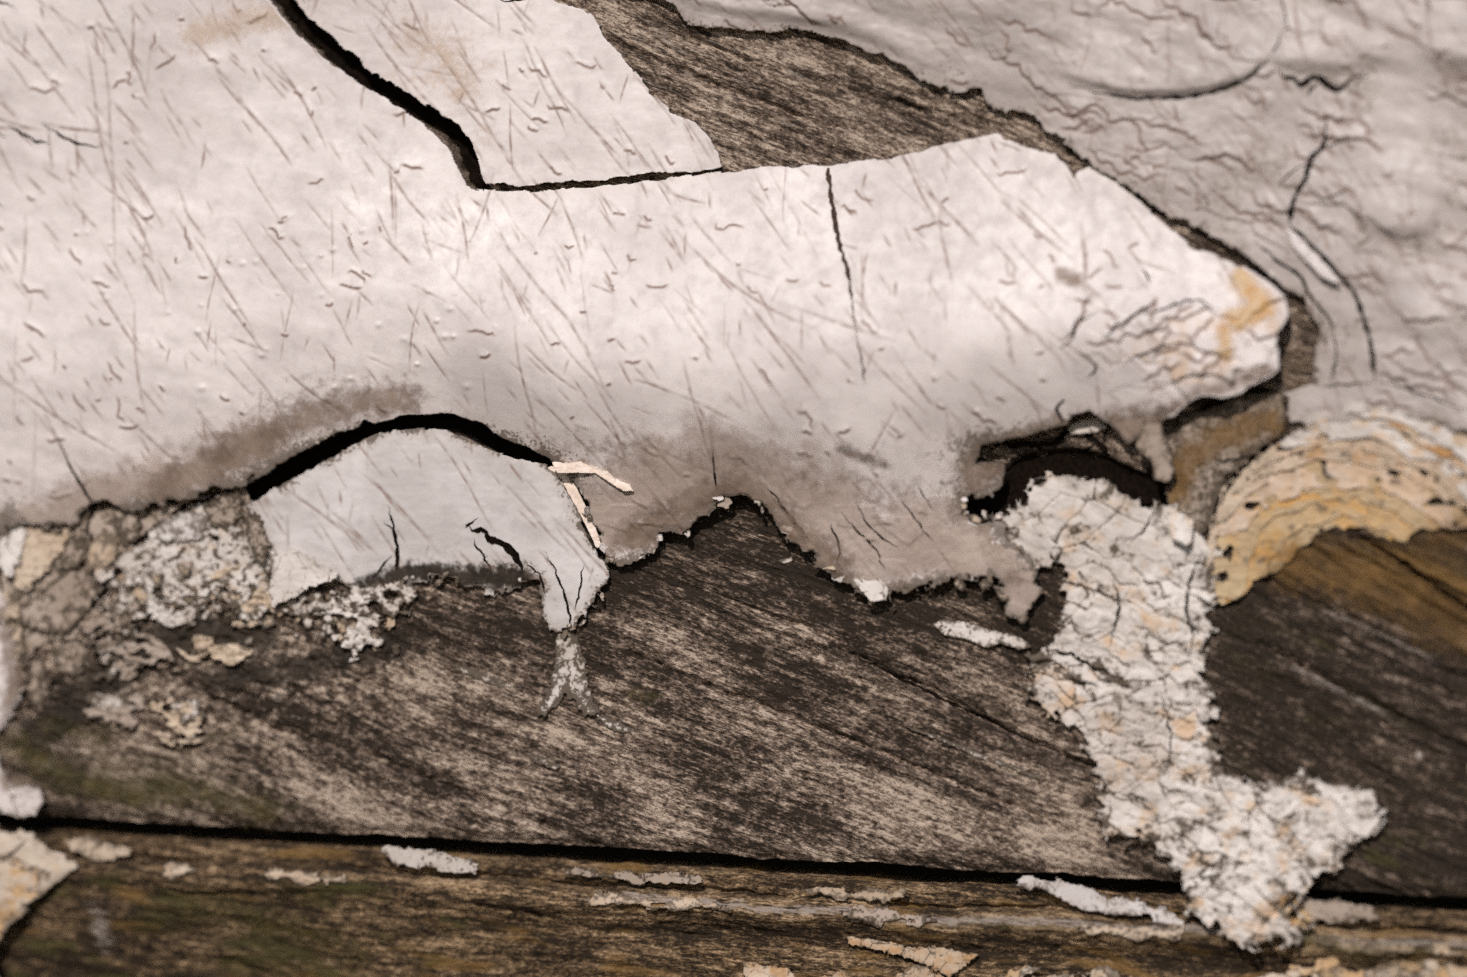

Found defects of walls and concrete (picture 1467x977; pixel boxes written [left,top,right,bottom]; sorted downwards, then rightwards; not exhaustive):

crack [275,0,491,188]
crack [56,413,553,633]
peeling [0,428,634,748]
crack [825,168,865,384]
crack [1040,580,1121,672]
crack [971,269,1218,545]
peeling [833,0,1467,977]
crack [1070,0,1467,658]
peeling [8,784,45,816]
peeling [381,845,479,875]
peeling [562,866,732,914]
peeling [801,886,979,977]